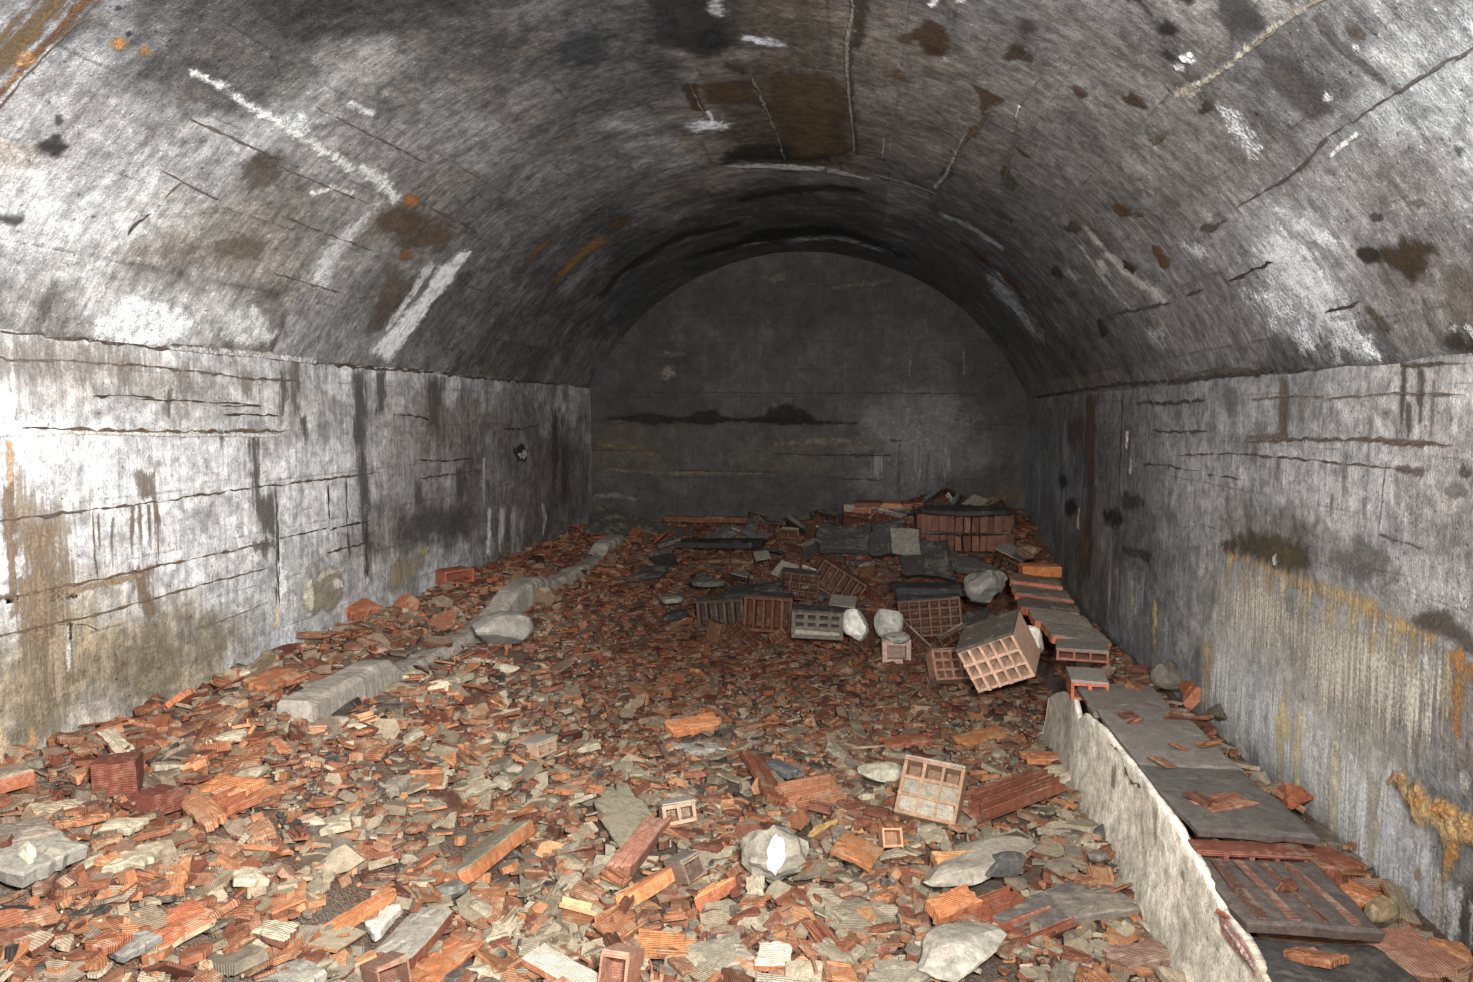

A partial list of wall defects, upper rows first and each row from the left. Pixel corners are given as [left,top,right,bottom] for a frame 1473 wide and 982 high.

water stain [177,70,401,288]
water stain [742,36,786,47]
crack [844,0,885,158]
crack [1237,47,1473,208]
crack [0,73,1469,578]
water stain [1241,201,1381,362]
water stain [1400,361,1444,437]
crack [0,472,377,637]
water stain [247,437,315,627]
water stain [1413,592,1473,653]
water stain [1199,625,1473,950]
rust [1216,546,1473,883]